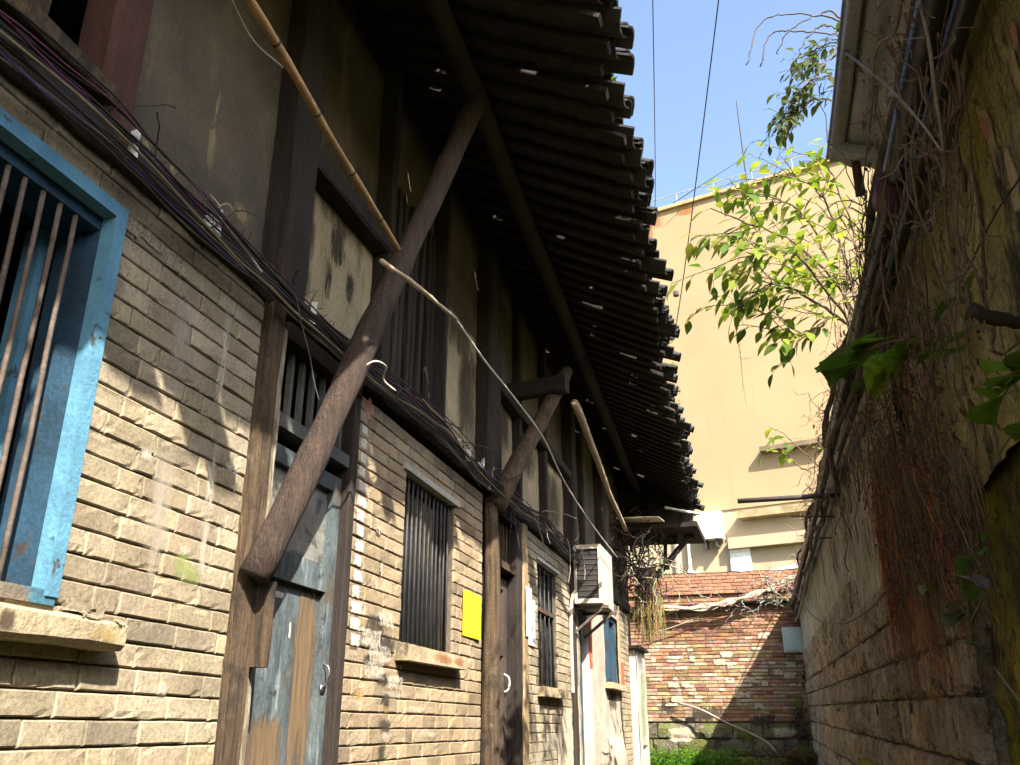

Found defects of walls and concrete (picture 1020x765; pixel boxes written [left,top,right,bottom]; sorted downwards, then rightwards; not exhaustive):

leakage [325,226,345,297]
leakage [346,275,354,304]
peeling [350,398,403,687]
peeling [245,587,317,765]